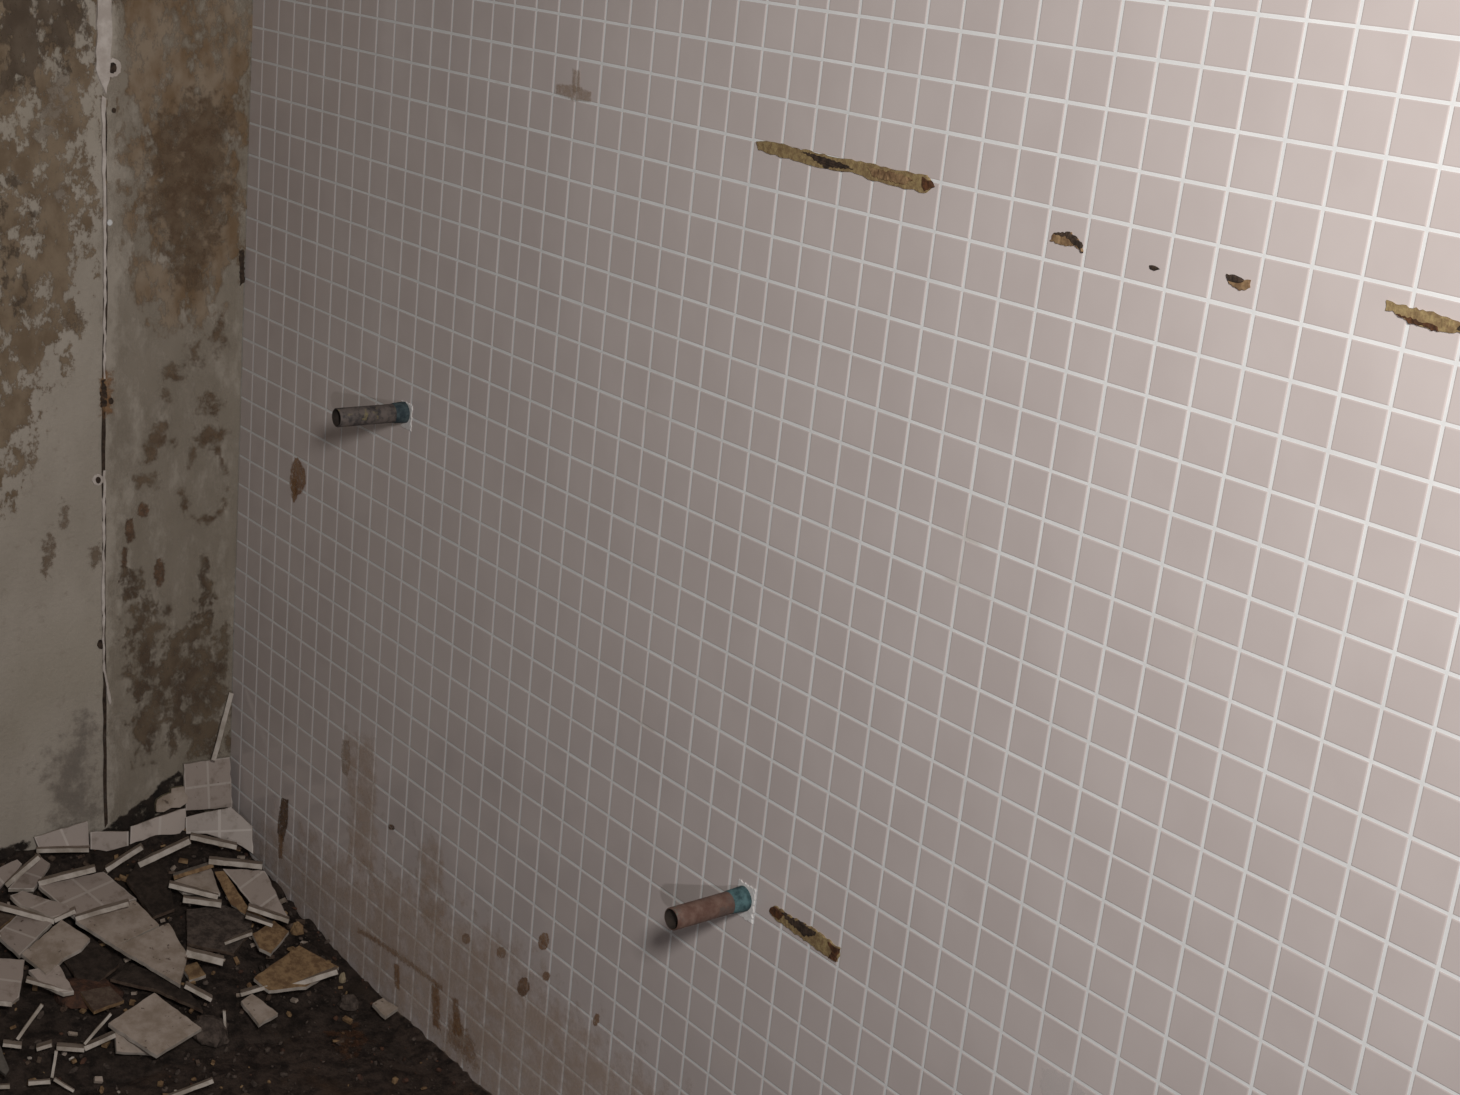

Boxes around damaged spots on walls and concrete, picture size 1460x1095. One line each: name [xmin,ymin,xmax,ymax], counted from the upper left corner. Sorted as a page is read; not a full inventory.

damp [0,0,96,95]
damp [0,176,40,317]
damp [102,0,253,831]
rust [290,458,306,502]
damp [41,506,69,578]